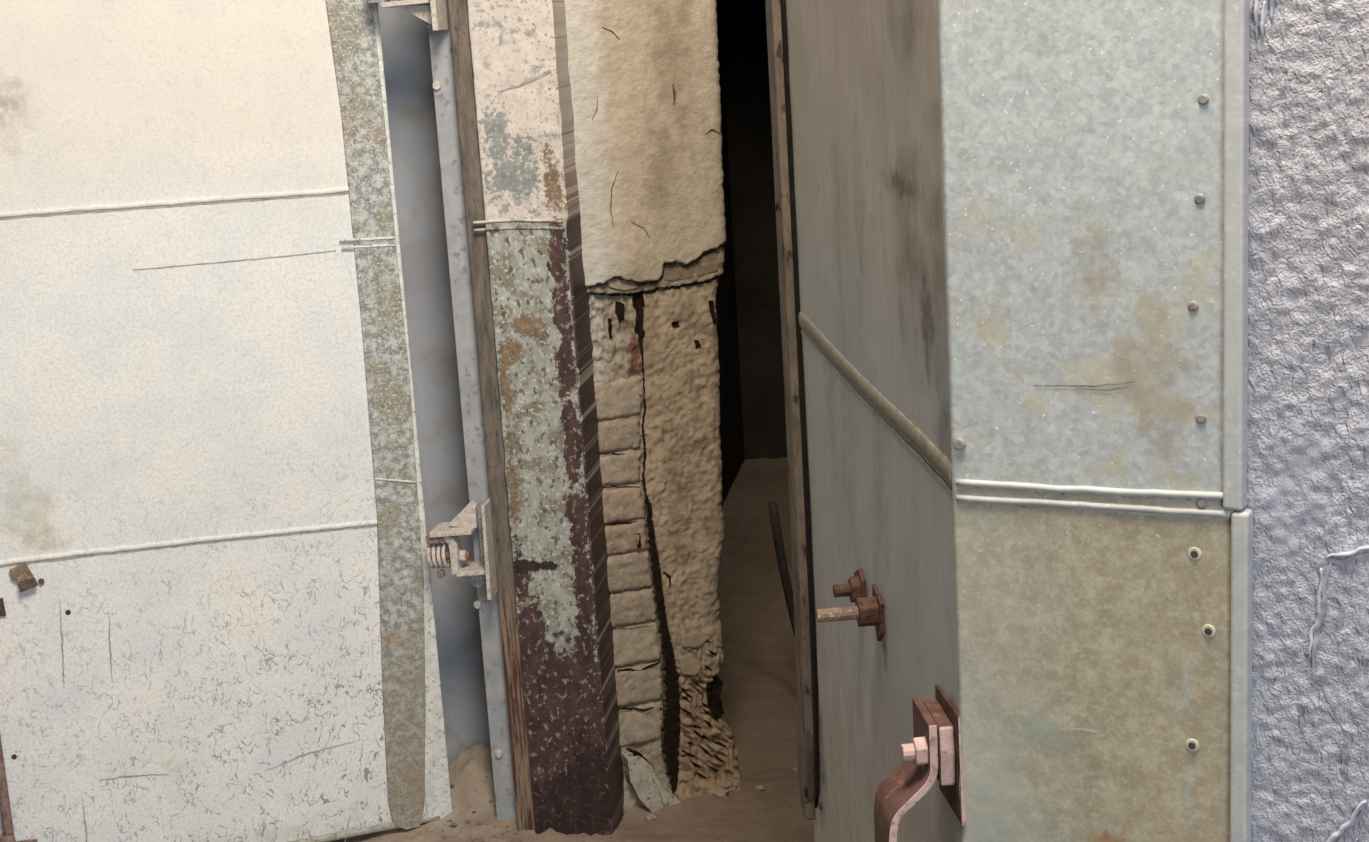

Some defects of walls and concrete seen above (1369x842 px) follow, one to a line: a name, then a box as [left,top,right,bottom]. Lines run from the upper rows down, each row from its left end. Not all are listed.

spalling [477,84,733,836]
crack [1253,545,1369,717]
crack [1336,810,1363,842]